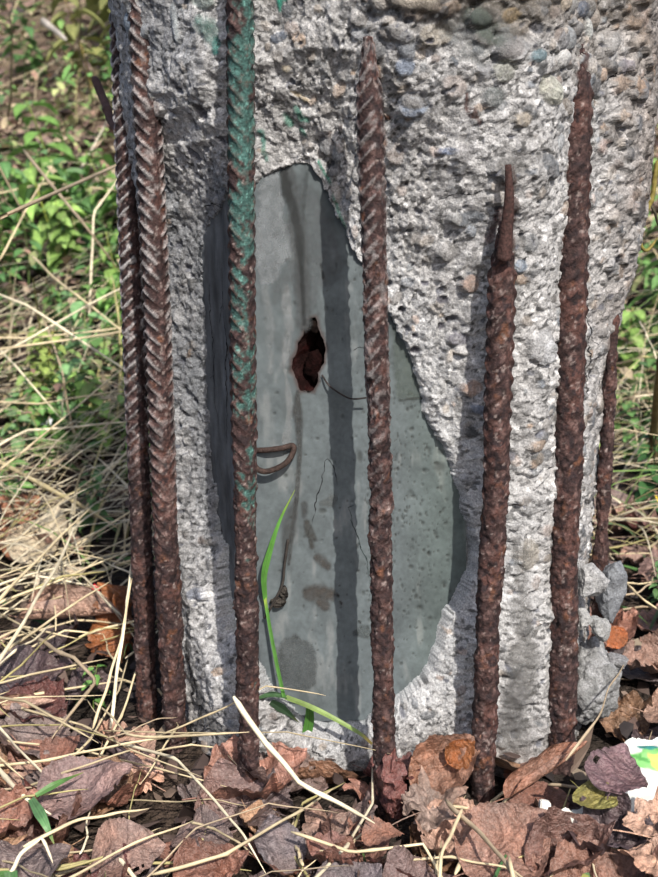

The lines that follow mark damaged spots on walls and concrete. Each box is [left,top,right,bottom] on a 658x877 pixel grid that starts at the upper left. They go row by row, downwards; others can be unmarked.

rust [577,52,590,90]
rust [486,208,502,243]
spalling [193,0,466,824]
crack [308,459,337,542]